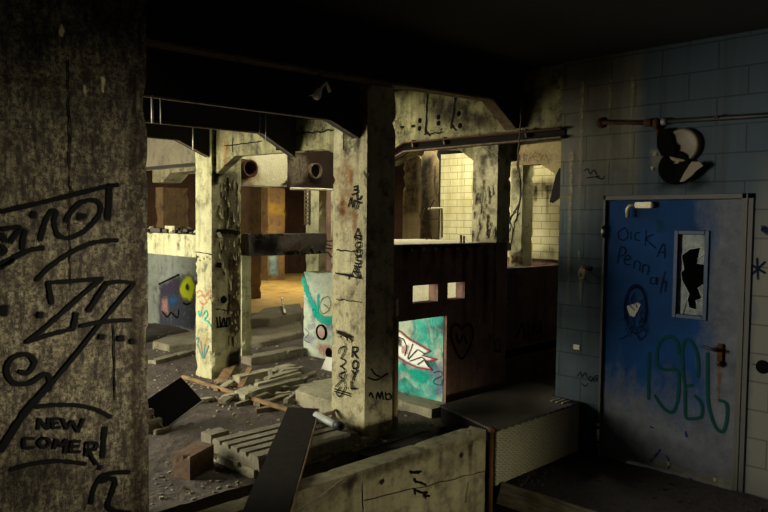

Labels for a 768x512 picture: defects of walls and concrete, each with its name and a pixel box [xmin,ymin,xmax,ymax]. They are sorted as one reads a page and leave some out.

crack [295,126,334,145]
peeling [197,173,241,367]